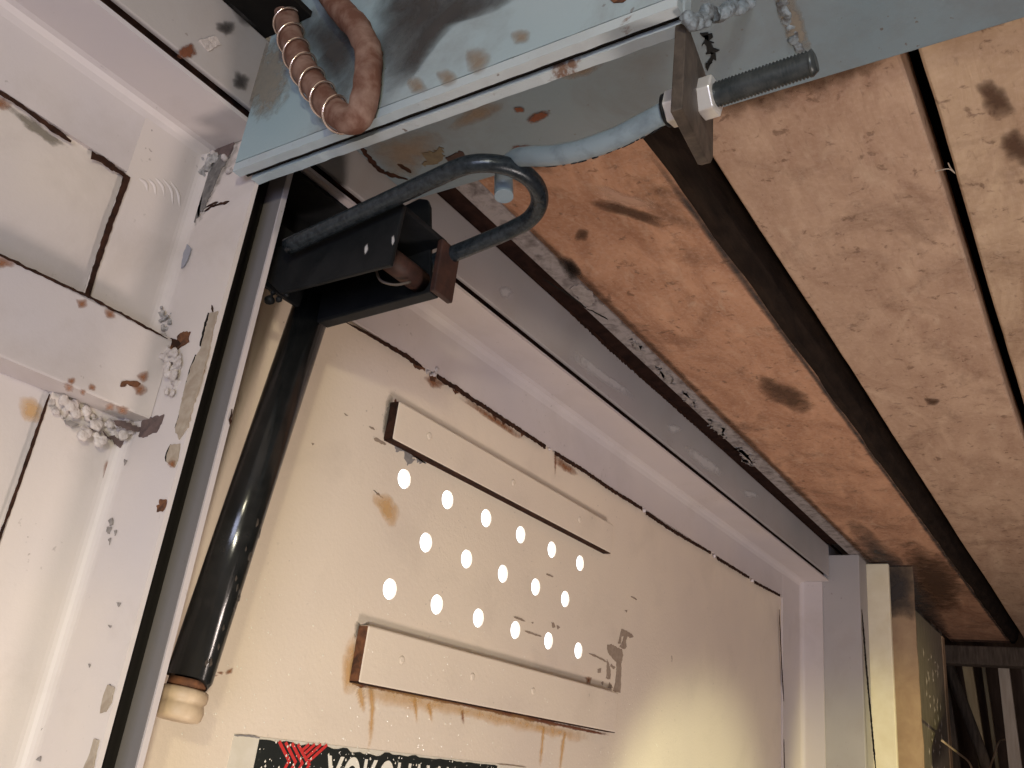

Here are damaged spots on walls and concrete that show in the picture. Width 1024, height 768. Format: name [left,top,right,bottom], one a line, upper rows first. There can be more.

rust [514,107,548,123]
peeling [194,142,235,223]
peeling [165,305,219,468]
rust [384,399,610,554]
rust [346,626,615,760]
spalling [587,629,634,693]